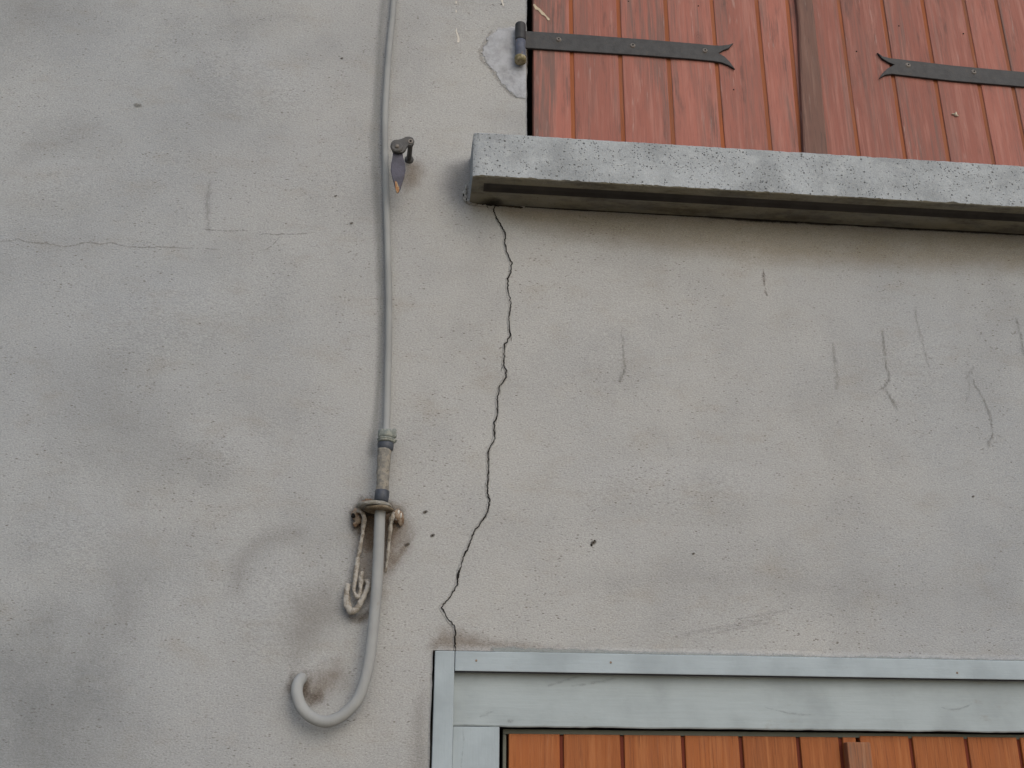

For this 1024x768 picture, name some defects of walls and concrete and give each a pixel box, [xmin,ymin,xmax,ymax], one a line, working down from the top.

peeling [481,27,526,98]
crack [439,200,523,650]